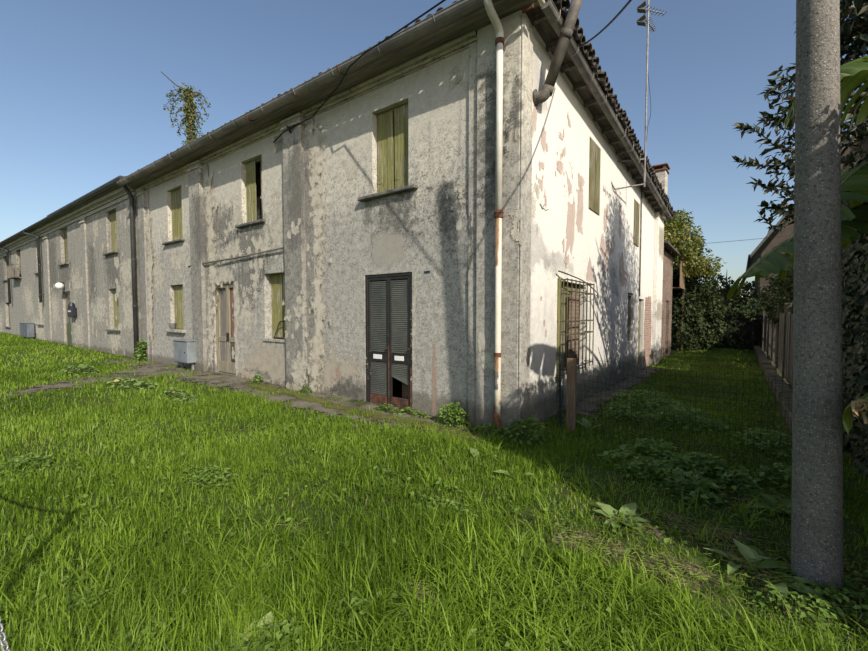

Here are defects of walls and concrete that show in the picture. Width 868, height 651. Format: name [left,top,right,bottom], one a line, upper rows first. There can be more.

leakage [365,71,523,240]
peeling [22,210,191,355]
leakage [194,197,273,309]
peeling [203,121,347,397]